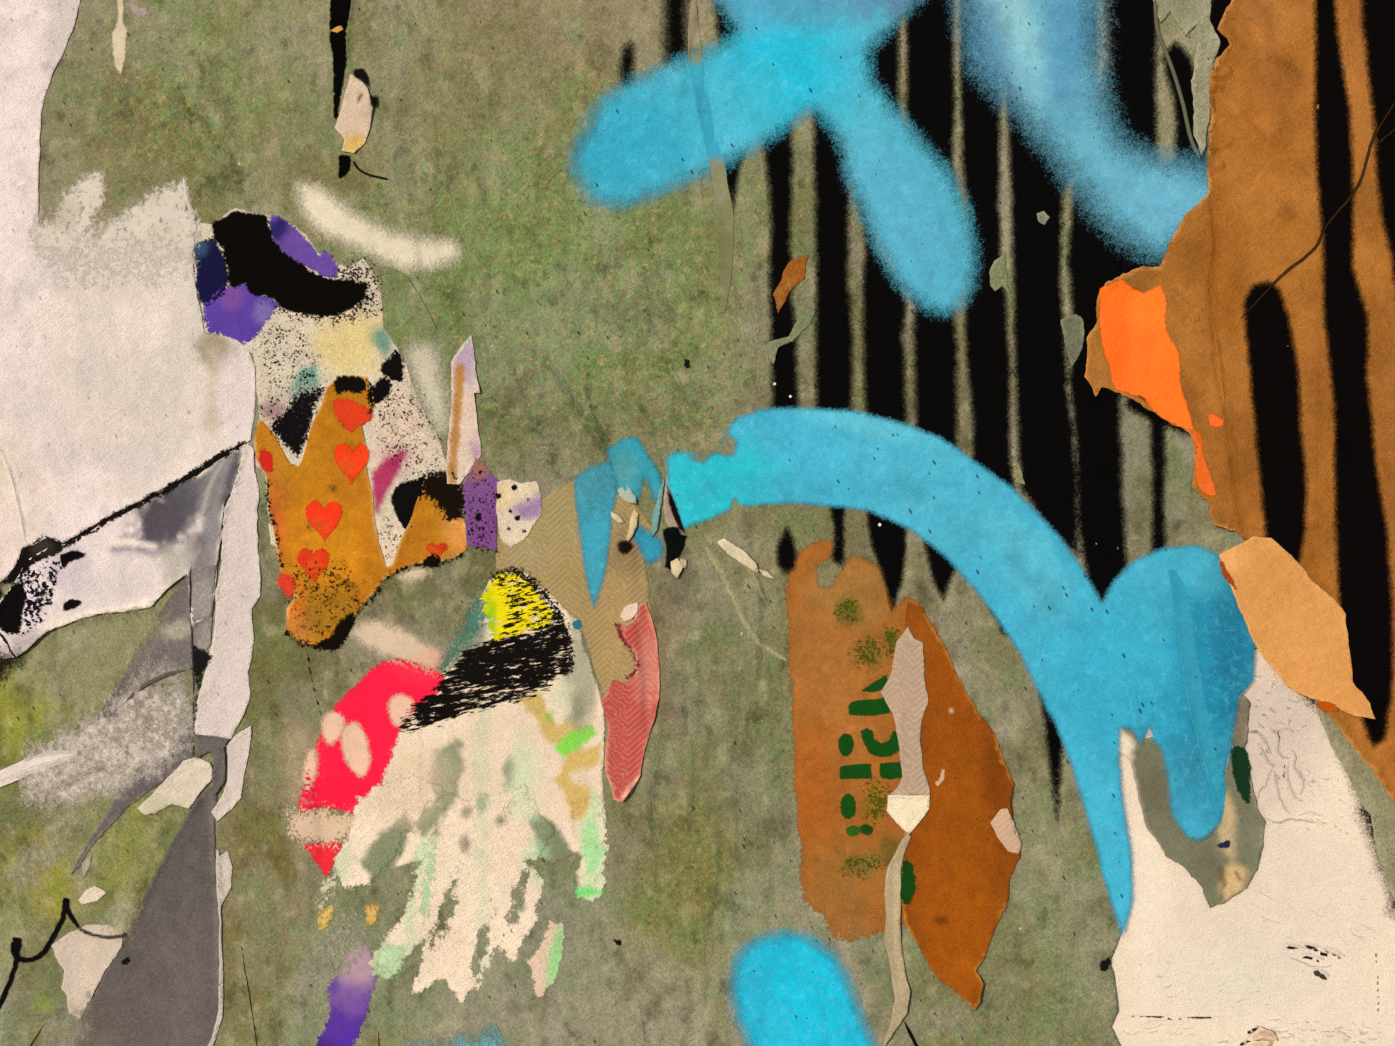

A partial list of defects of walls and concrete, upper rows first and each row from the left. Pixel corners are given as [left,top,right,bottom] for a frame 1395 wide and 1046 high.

peeling [1240,1026,1278,1046]